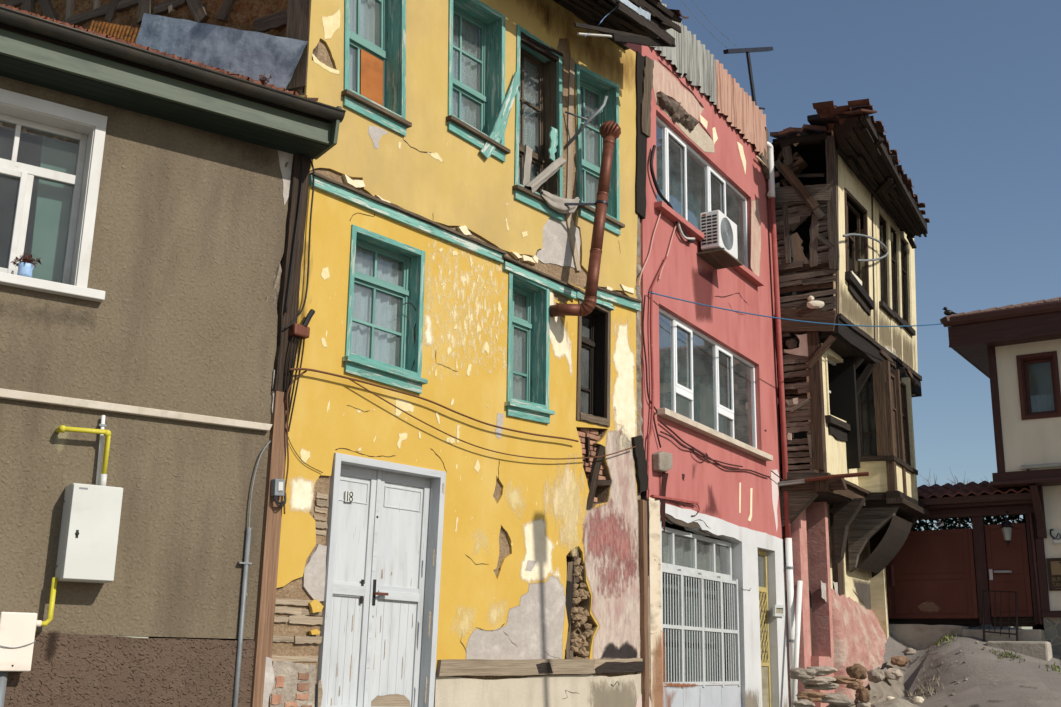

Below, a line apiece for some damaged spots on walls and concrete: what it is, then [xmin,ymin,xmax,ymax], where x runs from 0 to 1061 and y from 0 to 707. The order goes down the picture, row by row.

peeling [322,9,341,39]
peeling [312,54,339,74]
peeling [653,59,718,153]
peeling [737,142,746,174]
spalling [342,174,365,189]
flaking render [510,215,581,272]
peeling [425,237,508,380]
peeling [550,290,572,373]
peeling [395,399,414,416]
peeling [290,477,313,511]
peeling [466,317,640,660]
spalling [665,513,725,537]